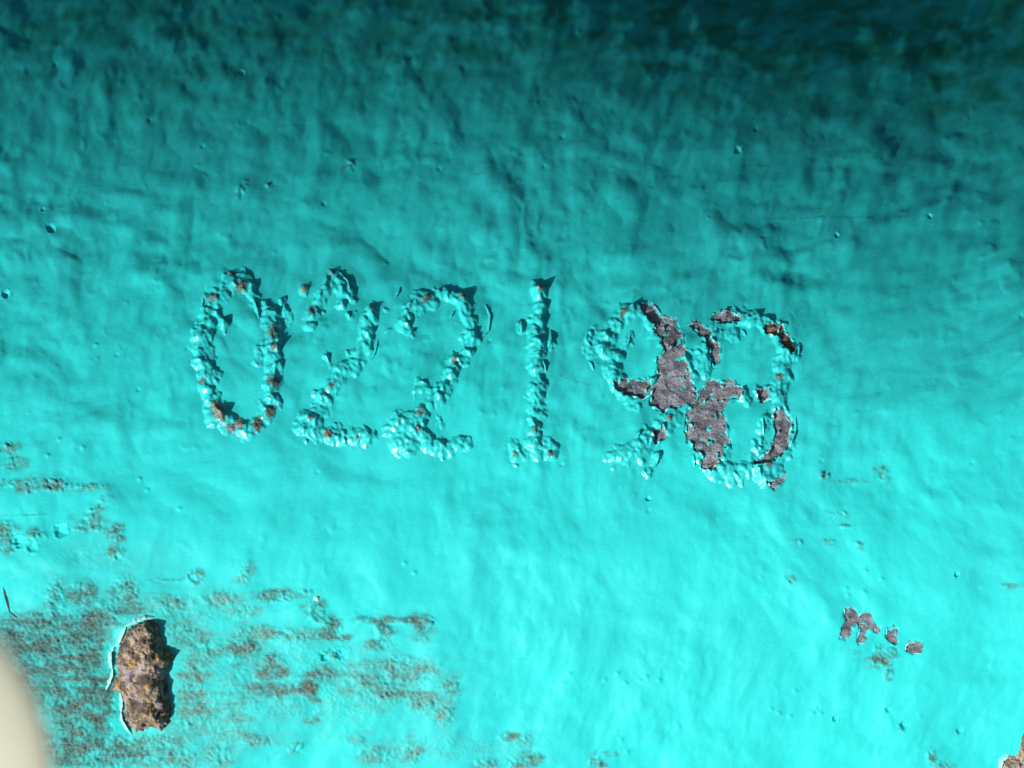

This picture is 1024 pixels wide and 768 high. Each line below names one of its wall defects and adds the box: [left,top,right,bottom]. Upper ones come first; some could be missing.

corrosion [268,324,279,351]
peeling [613,302,800,471]
corrosion [211,401,277,433]
peeling [767,471,787,491]
corrosion [314,600,350,640]
peeling [840,606,924,655]
corrosion [0,585,145,766]
corrosion [257,655,333,701]